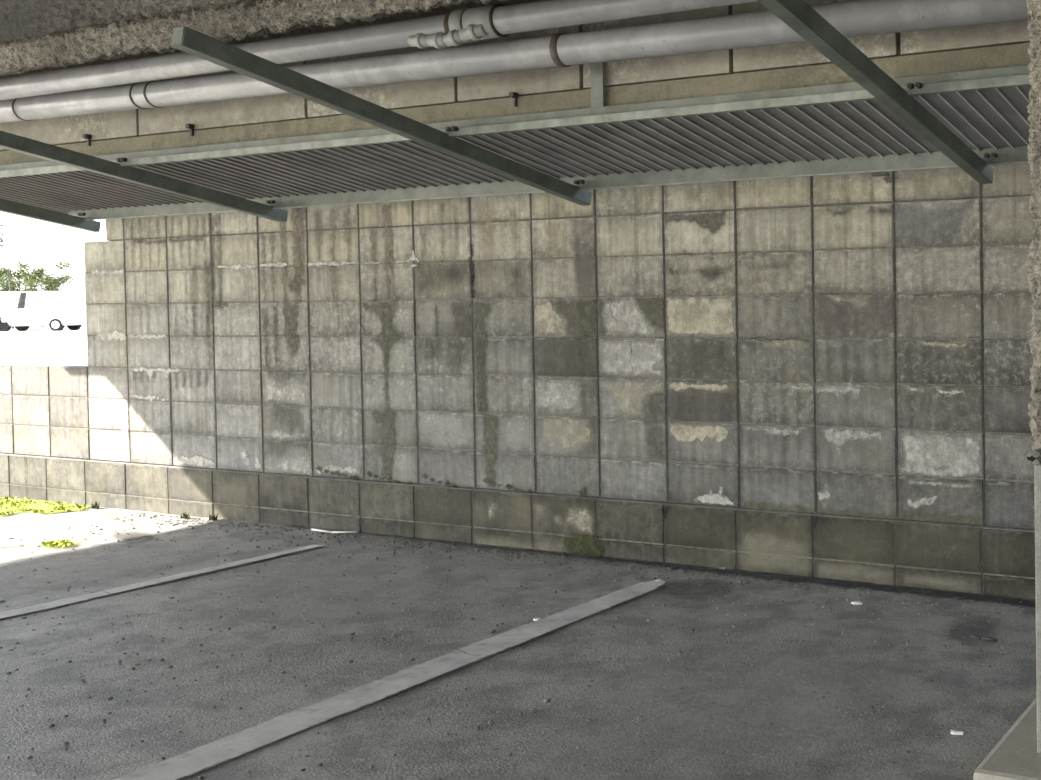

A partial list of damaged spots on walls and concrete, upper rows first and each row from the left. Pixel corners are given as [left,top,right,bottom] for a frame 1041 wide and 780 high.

leakage [638,298,664,329]
leakage [97,330,167,341]
leakage [130,205,412,475]
leakage [430,302,497,487]
leakage [696,486,733,505]
leakage [907,481,969,508]
leakage [365,531,1036,608]